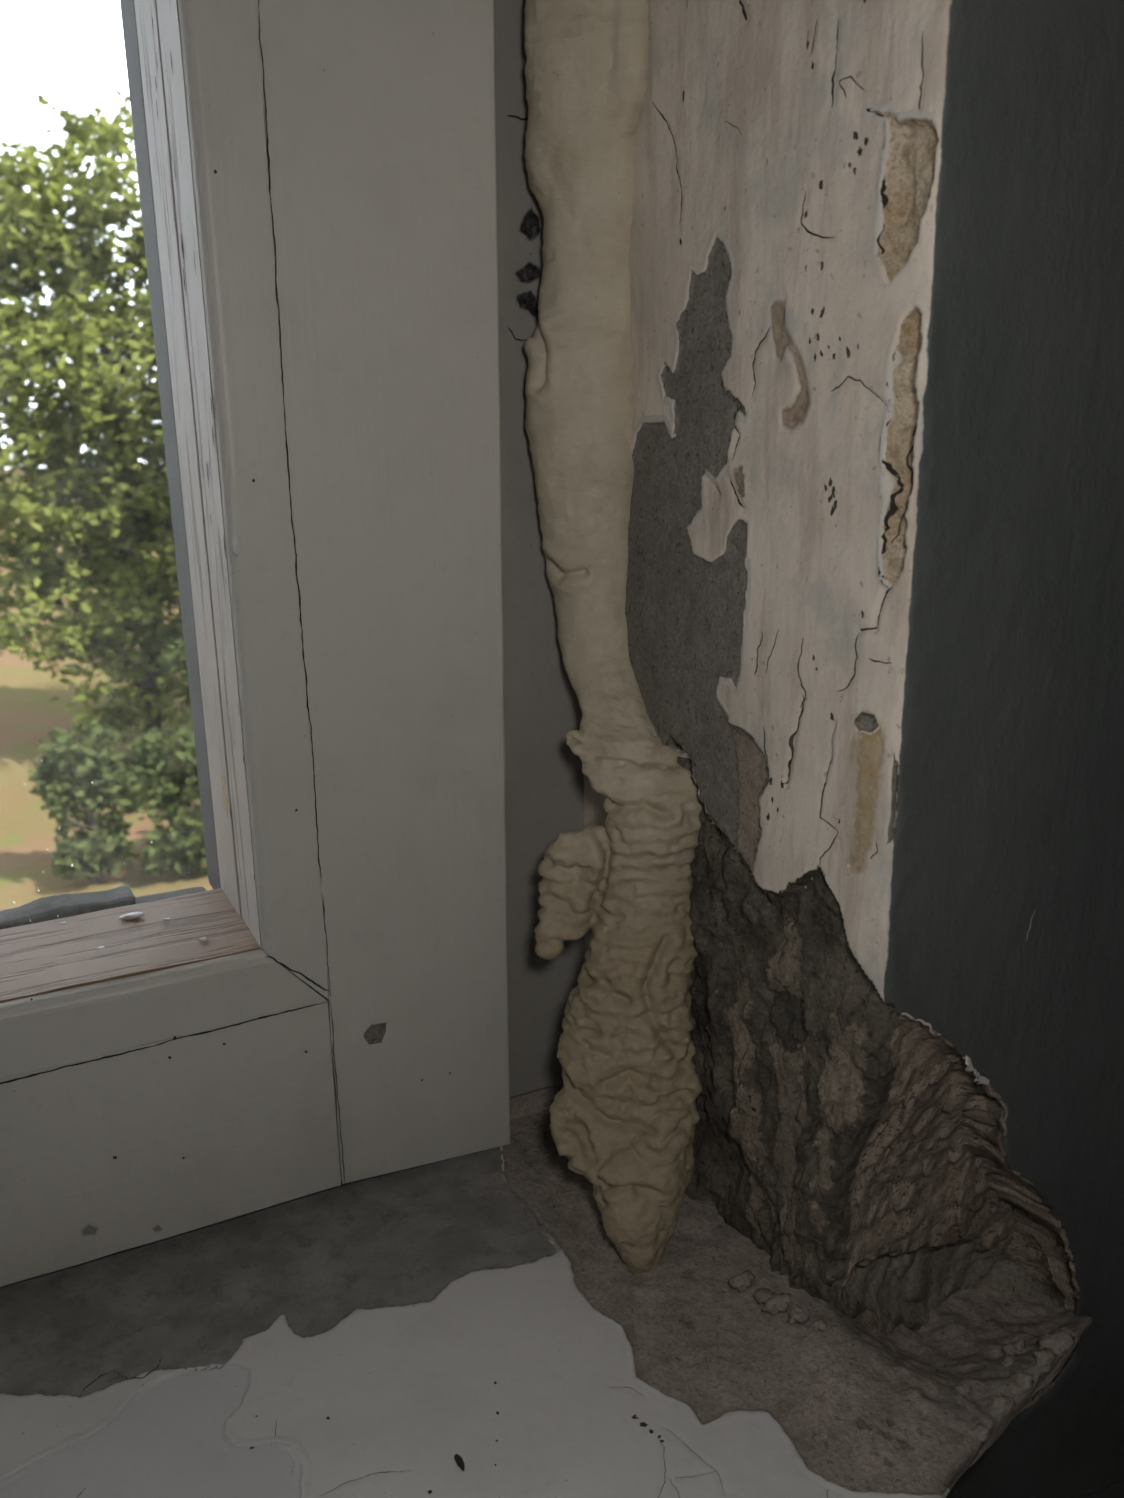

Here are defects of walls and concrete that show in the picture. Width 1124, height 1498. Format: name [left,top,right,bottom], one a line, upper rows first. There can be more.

crack [739,0,747,21]
crack [806,19,865,108]
crack [917,34,925,110]
crack [653,104,682,221]
crack [801,191,834,238]
crack [716,327,770,509]
crack [831,376,887,406]
crack [819,587,892,867]
spalling [625,230,1080,1337]
peeling [364,1023,387,1045]
peeling [0,1106,1094,1498]
crack [658,1428,725,1498]